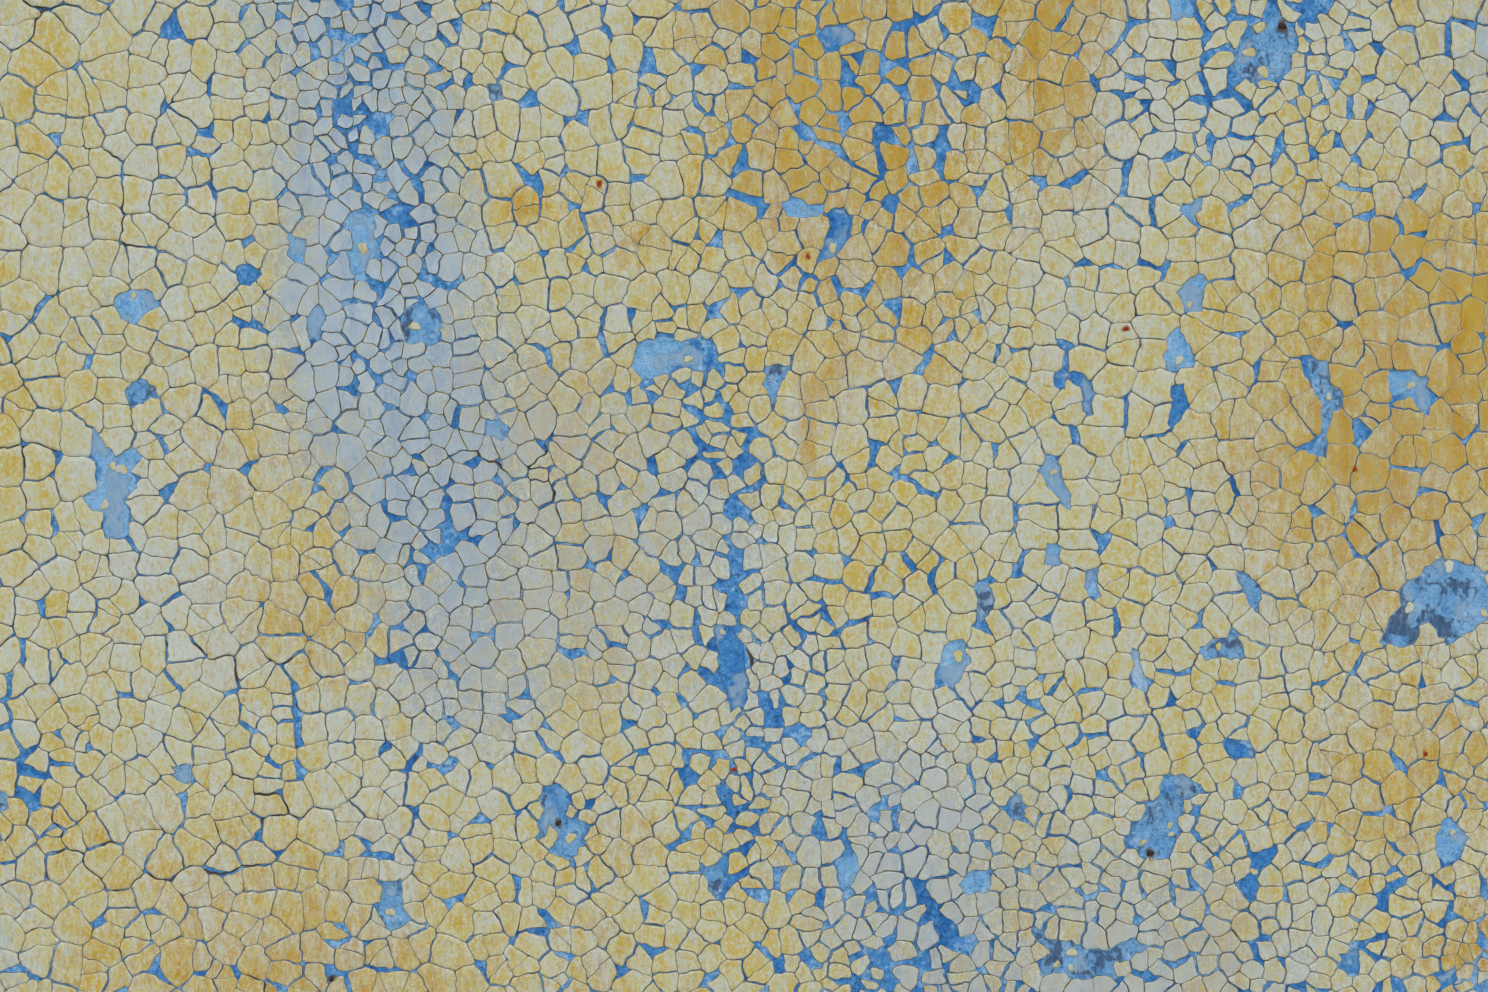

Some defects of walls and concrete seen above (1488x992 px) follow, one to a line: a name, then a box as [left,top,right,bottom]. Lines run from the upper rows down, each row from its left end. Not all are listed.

crack [23,0,78,32]
peeling [51,0,113,45]
peeling [1233,15,1298,84]
crack [106,150,163,277]
peeling [631,336,705,388]
crack [7,443,61,481]
peeling [54,427,142,539]
crack [471,443,559,515]
peeling [1366,540,1488,647]
crack [165,639,312,741]
crack [45,775,322,919]
peeling [1128,774,1202,859]